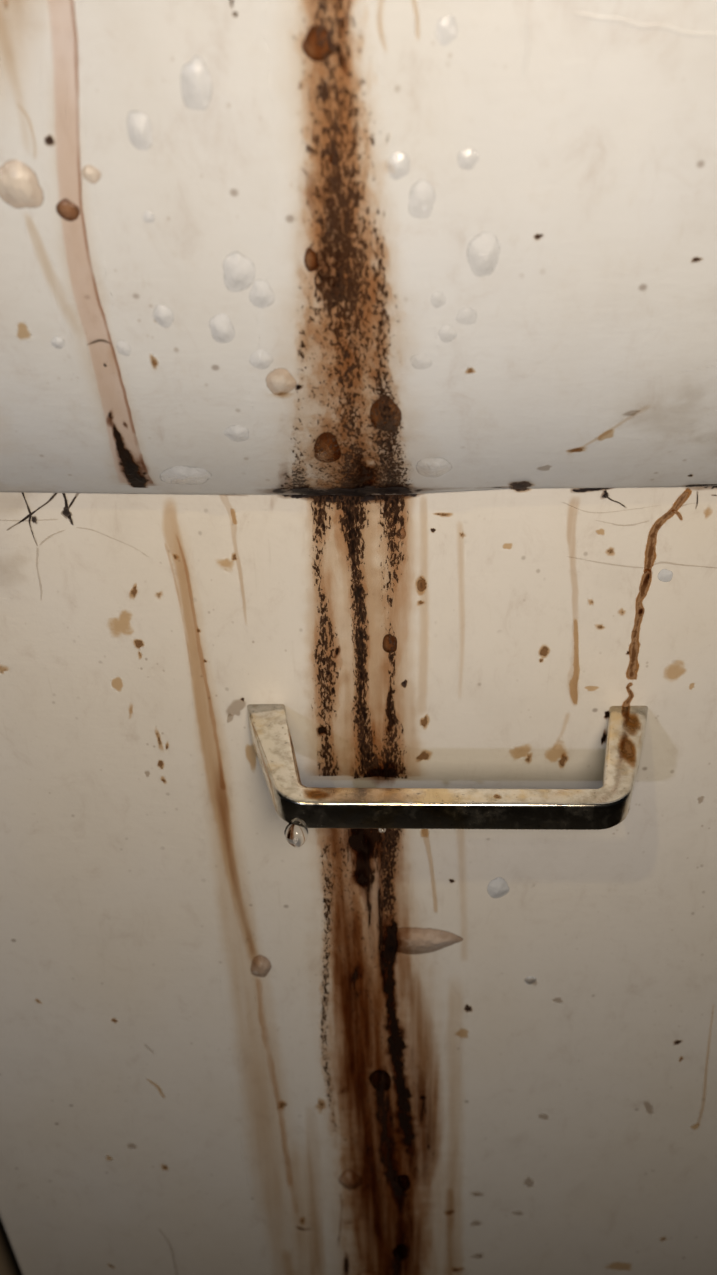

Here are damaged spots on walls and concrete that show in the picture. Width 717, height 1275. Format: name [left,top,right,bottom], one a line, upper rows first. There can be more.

crack [19,492,76,537]
rust [281,0,429,780]
rust [601,474,692,762]
rust [321,829,434,1275]